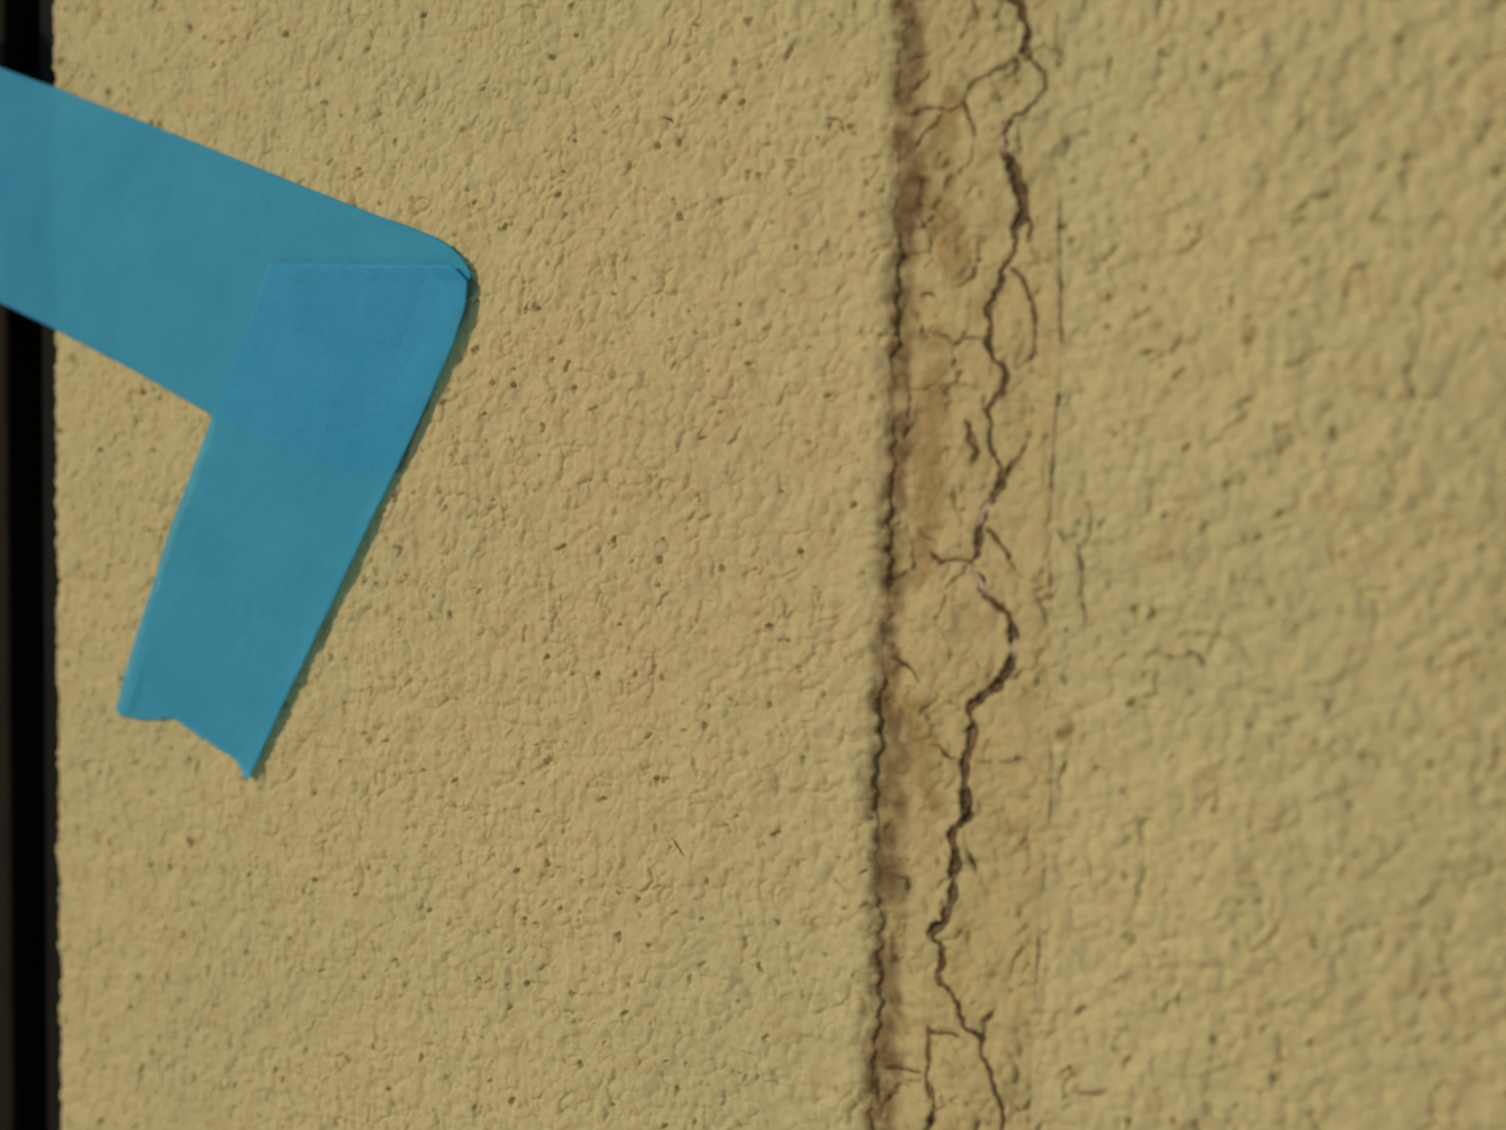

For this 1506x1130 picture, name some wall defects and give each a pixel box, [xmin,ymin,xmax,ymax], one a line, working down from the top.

crack [883,0,1047,1130]
crack [1073,532,1086,636]
crack [1075,1089,1109,1097]